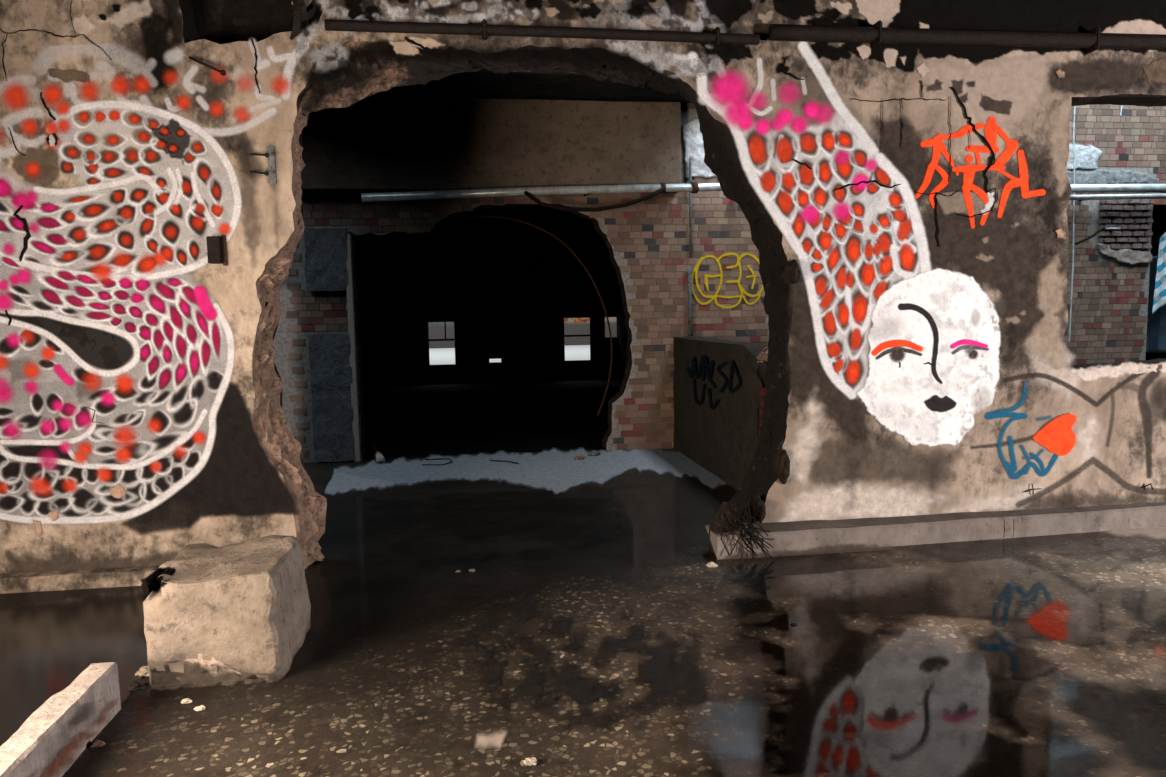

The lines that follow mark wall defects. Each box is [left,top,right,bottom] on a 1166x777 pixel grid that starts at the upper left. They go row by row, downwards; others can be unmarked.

crack [0,0,111,81]
peeling [830,0,900,27]
peeling [1102,19,1166,35]
peeling [857,44,1159,195]
crack [834,81,998,247]
spalling [981,192,994,215]
flaking render [1097,199,1154,265]
spalling [252,0,793,569]
spalling [1025,257,1166,381]
leakage [781,279,952,522]
leakage [1079,419,1096,458]
leakage [951,486,1150,512]